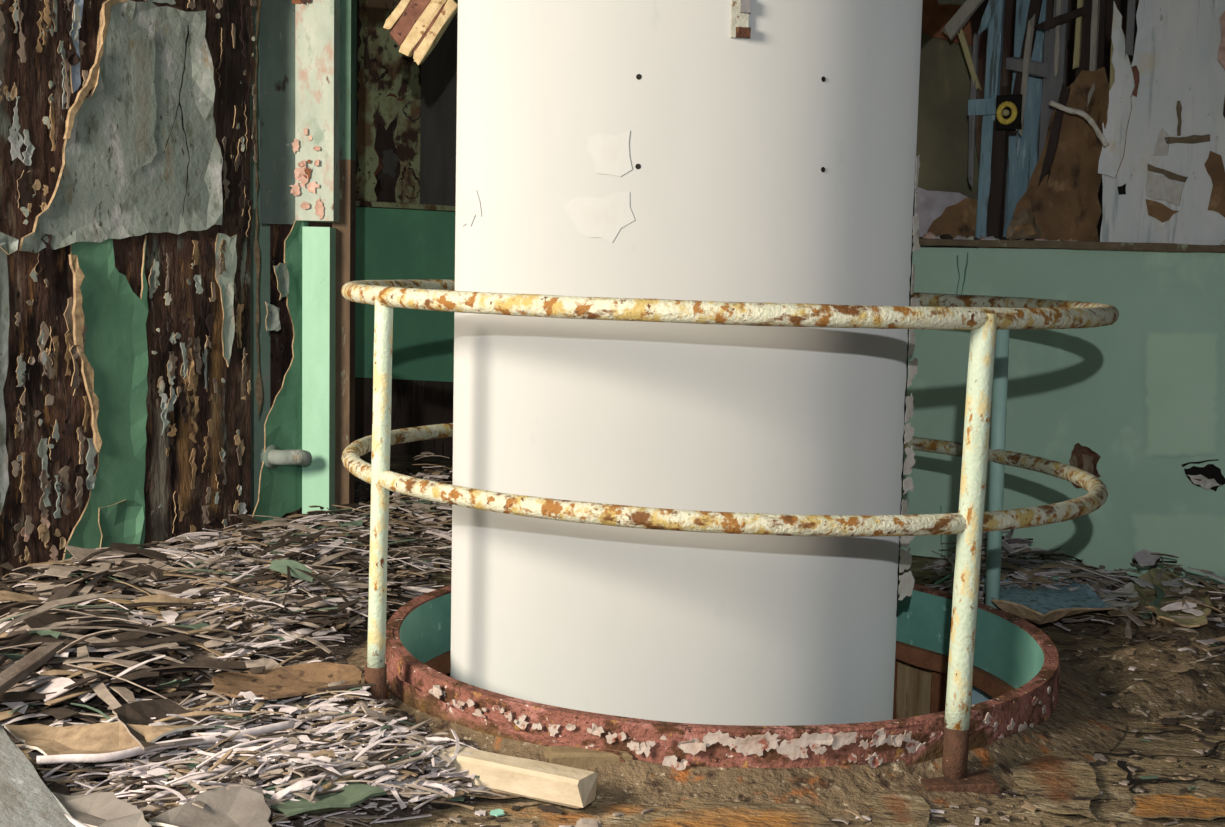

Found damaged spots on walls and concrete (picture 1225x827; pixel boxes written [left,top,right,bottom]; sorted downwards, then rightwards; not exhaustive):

peeling [1132,65,1140,97]
peeling [356,0,421,204]
peeling [1204,151,1225,217]
peeling [1146,199,1179,223]
peeling [0,0,324,562]
spalling [1069,443,1101,477]
spalling [1184,464,1225,491]
peeling [978,529,1225,647]
corrosion [388,672,624,763]
corrosion [904,734,944,766]
corrosion [968,726,994,751]